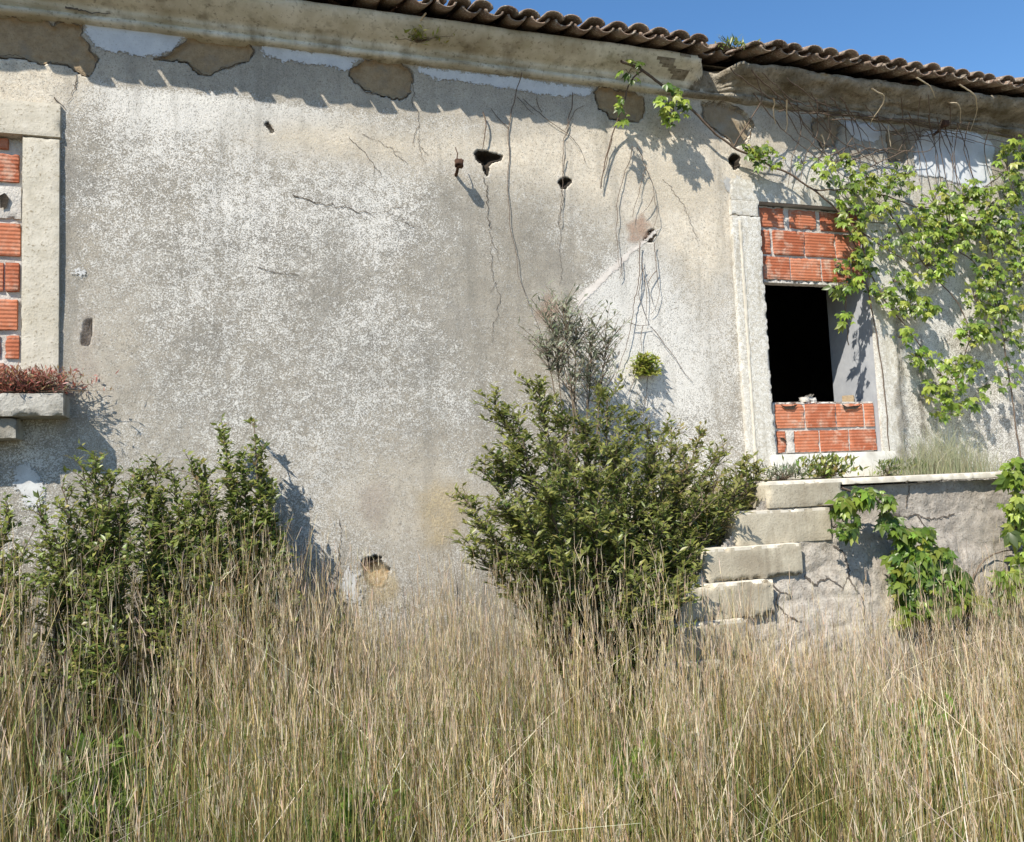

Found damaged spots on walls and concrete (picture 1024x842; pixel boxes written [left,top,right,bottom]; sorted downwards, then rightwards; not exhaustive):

spalling [0,16,645,122]
spalling [475,150,502,175]
crack [293,195,414,227]
crack [483,177,501,343]
peeling [340,556,390,606]
crack [773,545,865,628]